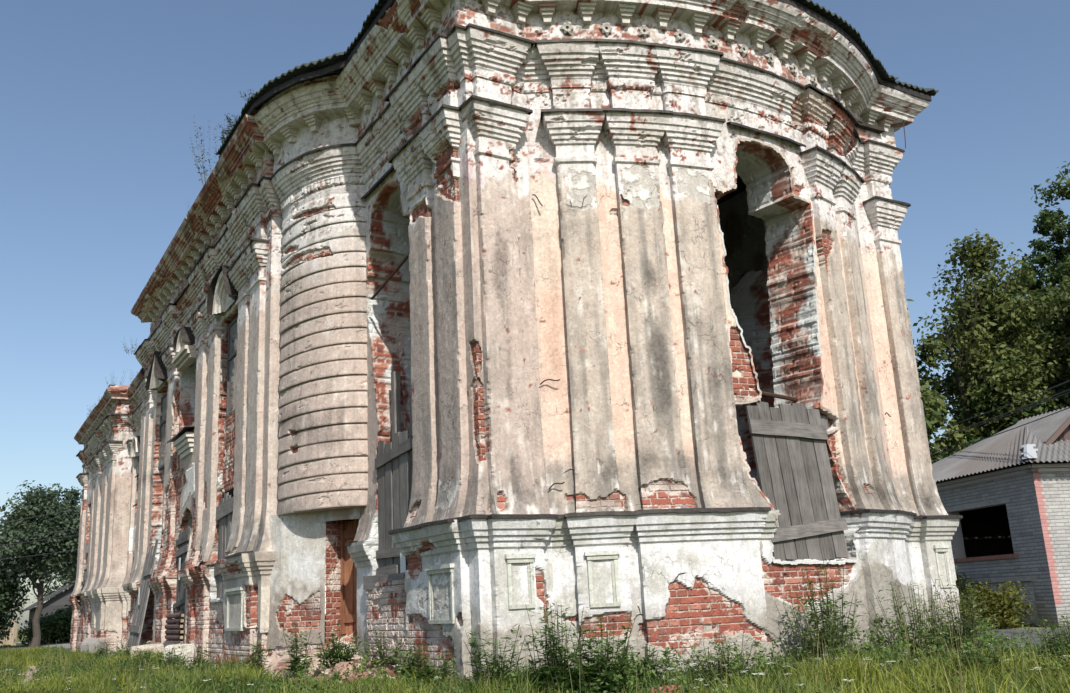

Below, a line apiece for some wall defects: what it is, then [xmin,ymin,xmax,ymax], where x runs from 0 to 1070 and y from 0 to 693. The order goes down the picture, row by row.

flaking render [379,0,421,34]
flaking render [722,1,749,22]
flaking render [434,82,460,102]
flaking render [433,139,460,202]
flaking render [294,206,336,226]
flaking render [284,246,333,269]
flaking render [471,341,490,462]
flaking render [565,490,626,509]
flaking render [638,480,696,509]
flaking render [68,382,326,668]
flaking render [405,541,463,685]
flaking render [563,577,773,655]